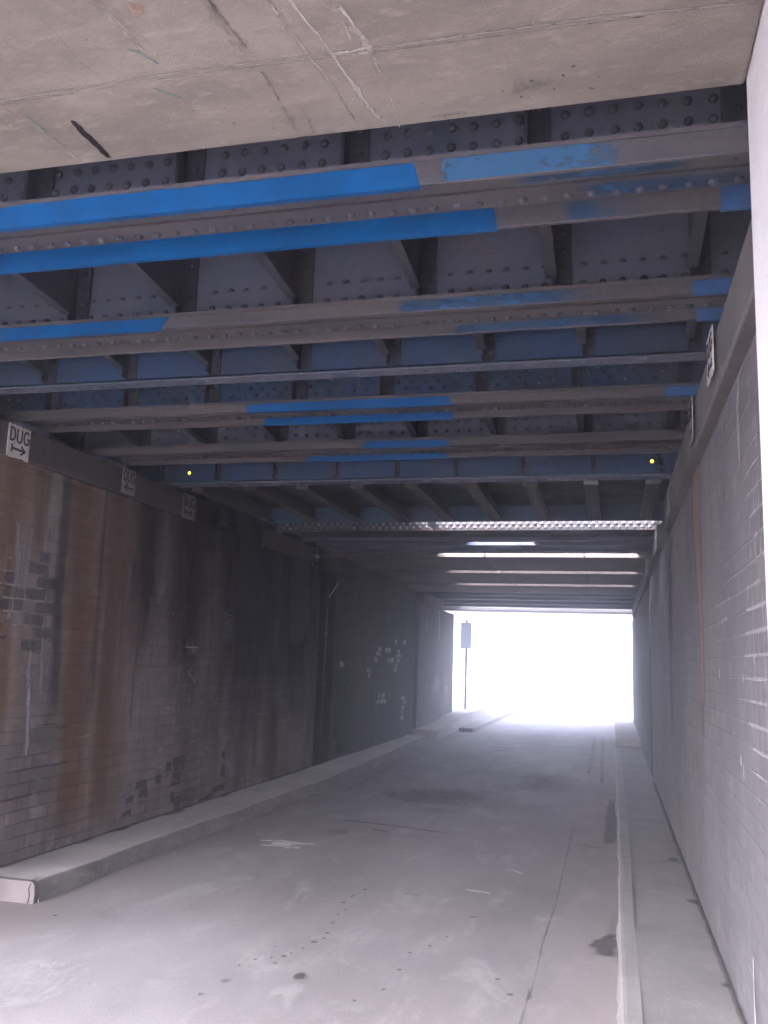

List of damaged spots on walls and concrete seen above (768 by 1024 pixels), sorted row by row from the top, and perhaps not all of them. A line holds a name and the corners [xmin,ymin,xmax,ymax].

spalling [0,553,57,651]
leakage [171,486,323,694]